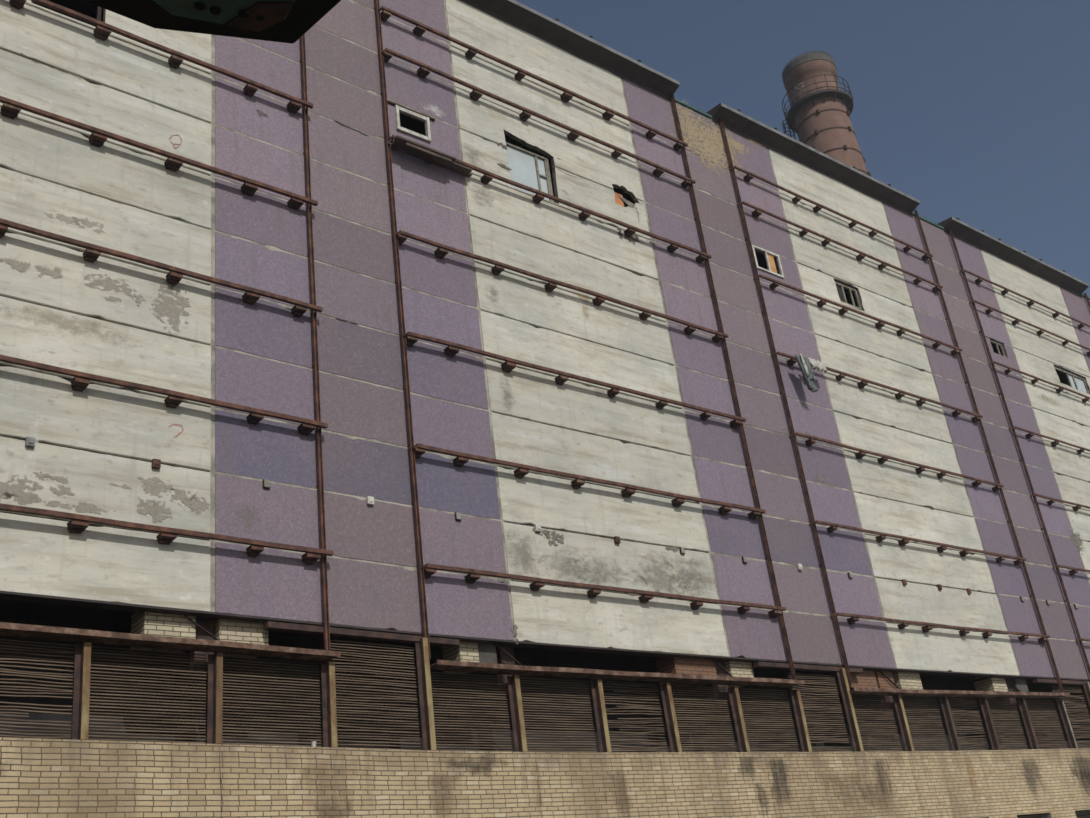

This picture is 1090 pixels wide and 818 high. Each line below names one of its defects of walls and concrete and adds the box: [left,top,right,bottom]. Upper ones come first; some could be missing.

peeling [0,256,62,278]
peeling [84,273,191,334]
peeling [0,471,115,514]
peeling [110,477,210,522]